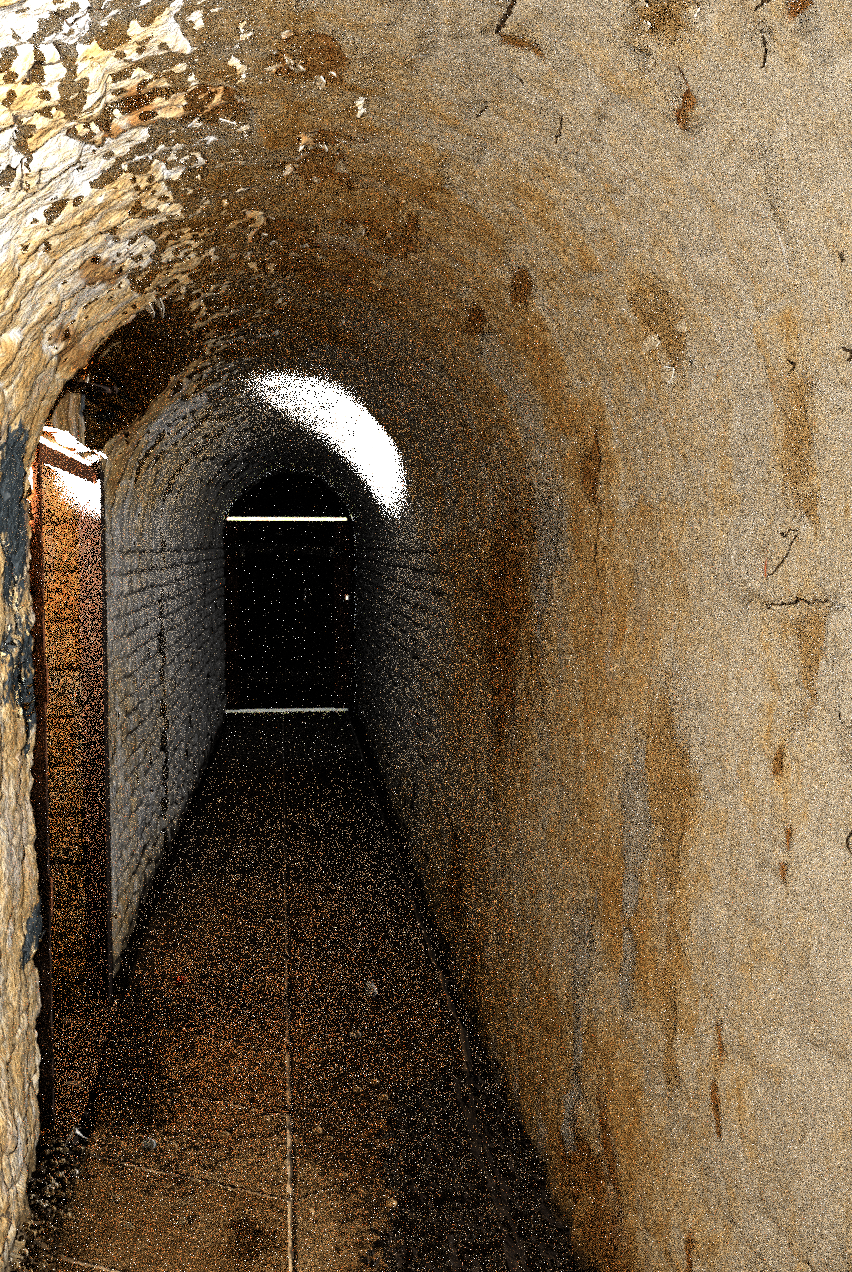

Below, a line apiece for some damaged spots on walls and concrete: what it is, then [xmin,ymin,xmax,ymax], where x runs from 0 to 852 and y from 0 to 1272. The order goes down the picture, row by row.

crack [495,0,523,45]
crack [754,0,770,68]
peeling [80,369,134,424]
water stain [534,498,564,646]
water stain [619,684,690,1010]
water stain [662,985,680,1088]